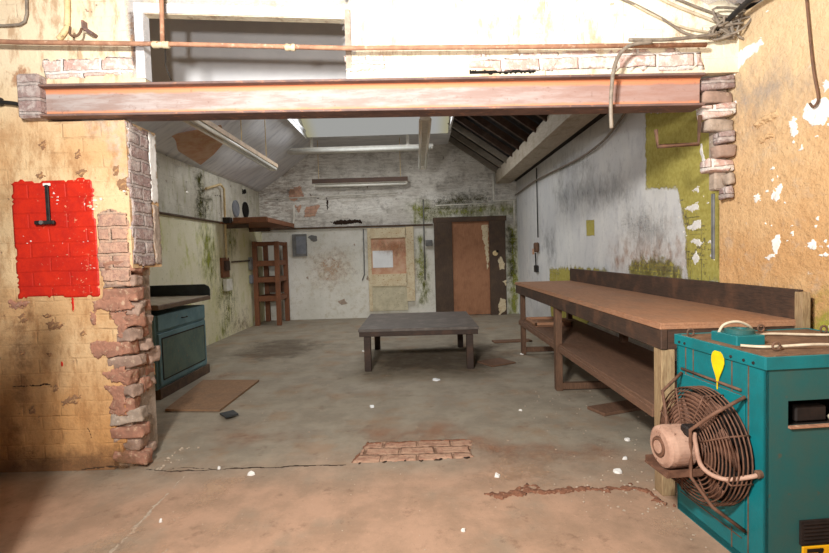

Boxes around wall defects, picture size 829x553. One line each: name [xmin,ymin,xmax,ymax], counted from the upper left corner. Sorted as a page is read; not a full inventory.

flaking render [42,55,134,79]
flaking render [344,54,386,72]
flaking render [469,37,764,200]
peeling [788,80,829,151]
peeling [753,167,786,204]
leakage [412,195,487,223]
peeling [481,225,505,270]
peeling [765,225,794,260]
peeling [805,239,829,257]
spalling [80,121,162,466]
peeling [43,313,63,331]
crack [82,465,343,553]